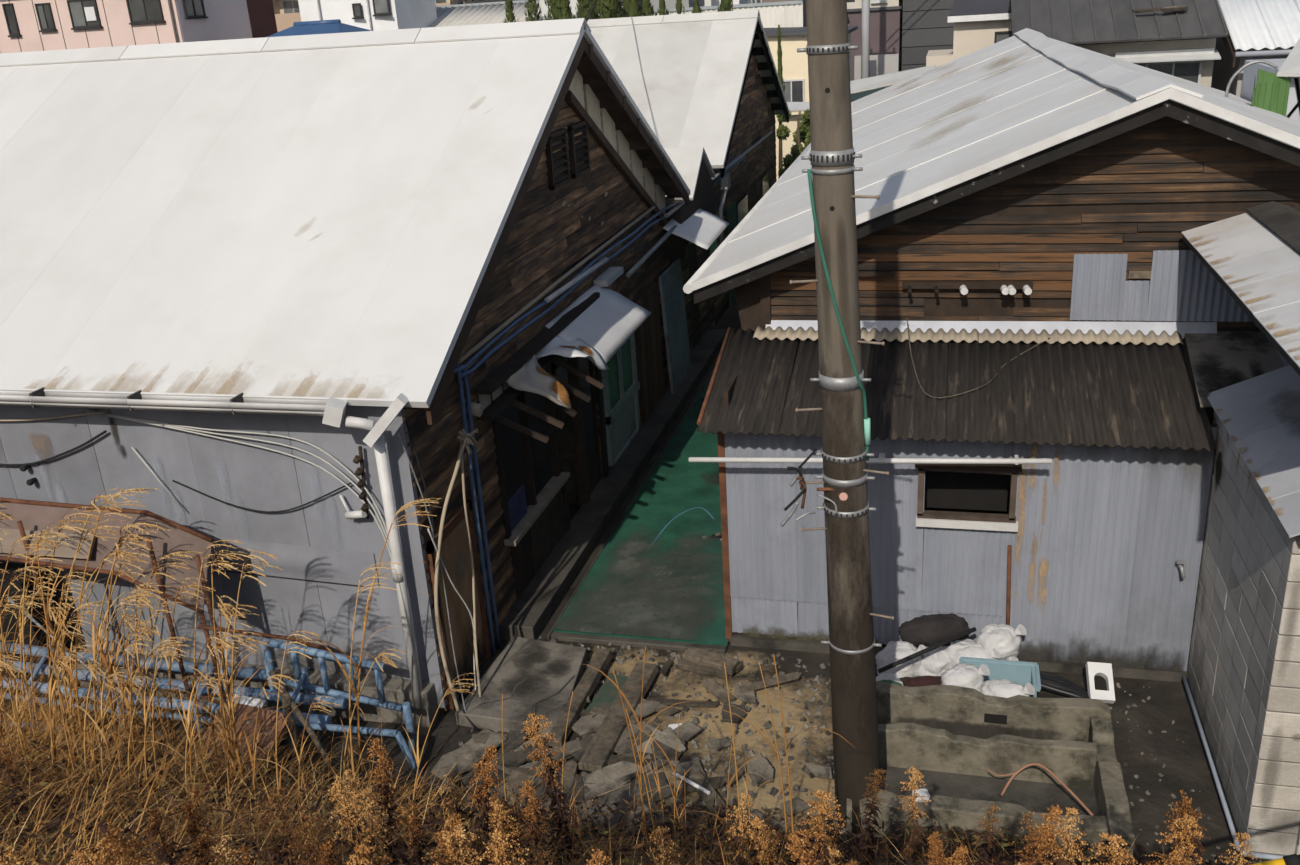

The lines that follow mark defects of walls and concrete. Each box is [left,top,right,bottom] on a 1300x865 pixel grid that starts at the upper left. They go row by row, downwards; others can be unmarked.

corrosion [537,367,571,407]